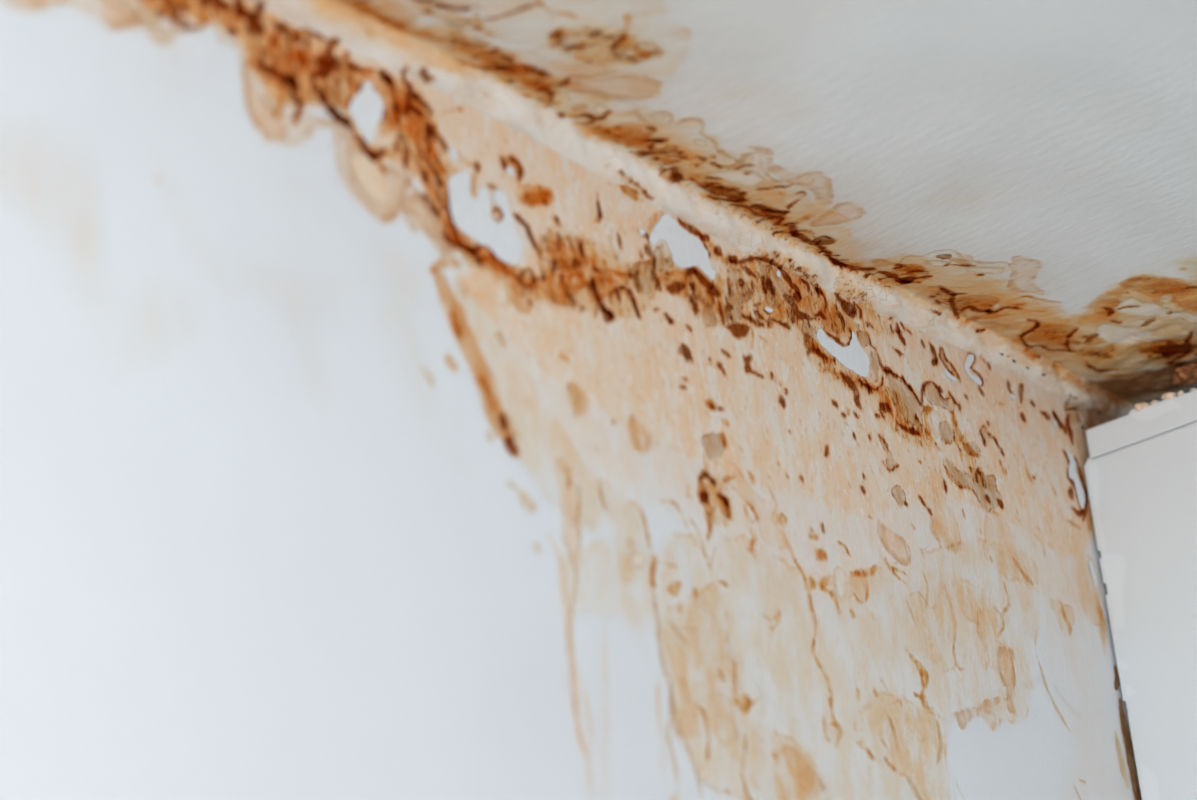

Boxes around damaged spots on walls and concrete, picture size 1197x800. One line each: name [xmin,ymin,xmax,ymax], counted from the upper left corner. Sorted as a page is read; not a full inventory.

peeling [349,80,384,144]
peeling [448,147,524,266]
peeling [639,214,716,279]
damp [133,0,1120,733]
peeling [817,328,869,377]
peeling [943,353,982,385]
peeling [1066,450,1085,509]
damp [1119,700,1142,800]